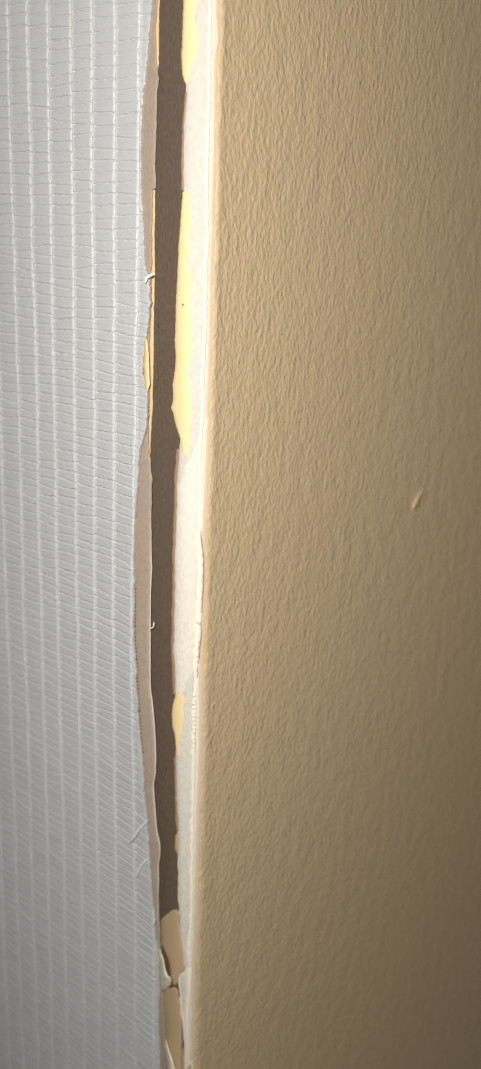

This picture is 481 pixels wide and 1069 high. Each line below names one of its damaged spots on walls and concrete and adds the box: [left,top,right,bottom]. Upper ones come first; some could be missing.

peeling [143,189,155,456]
flaking render [161,0,208,1069]
crack [196,536,204,677]